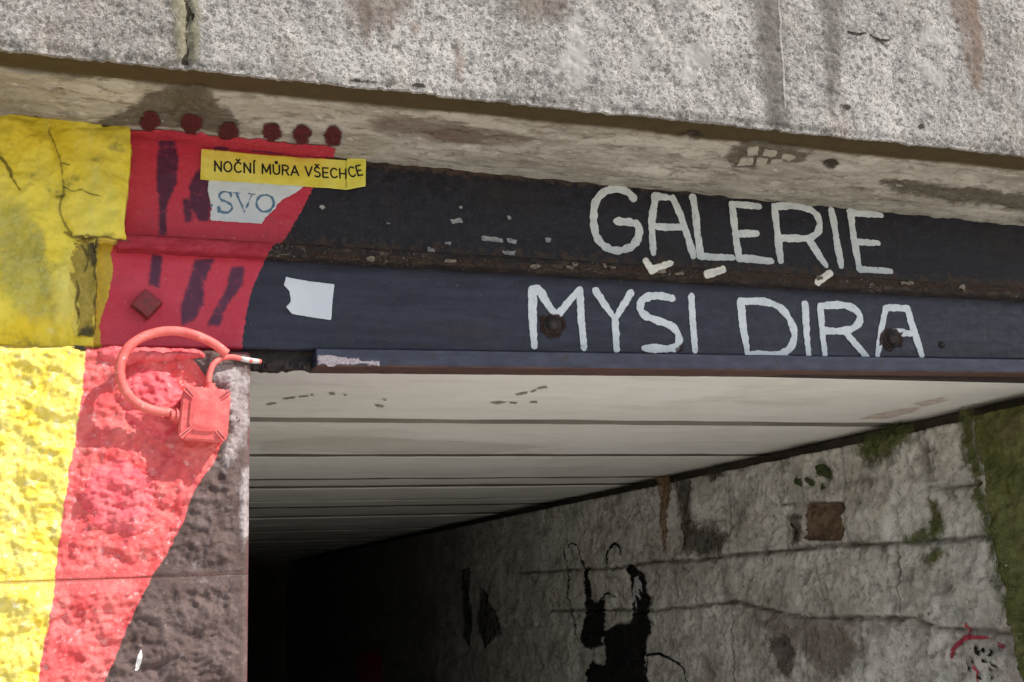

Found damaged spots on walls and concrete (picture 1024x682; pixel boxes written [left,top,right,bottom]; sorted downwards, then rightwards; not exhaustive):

crack [181,0,195,65]
flaking render [727,140,811,169]
crack [48,126,130,241]
corrosion [309,252,1024,293]
corrosion [539,314,566,338]
corrosion [879,329,903,352]
corrosion [657,475,672,551]